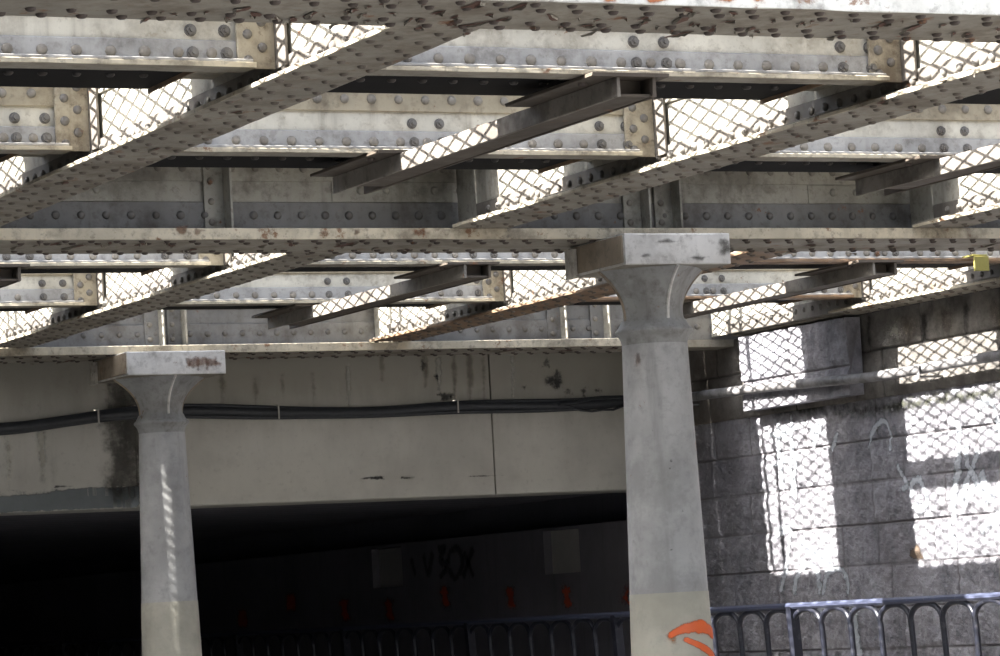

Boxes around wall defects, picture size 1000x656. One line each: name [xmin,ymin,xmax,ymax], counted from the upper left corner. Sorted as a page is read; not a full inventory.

water stain [544,360,569,394]
water stain [107,383,137,409]
water stain [104,420,140,498]